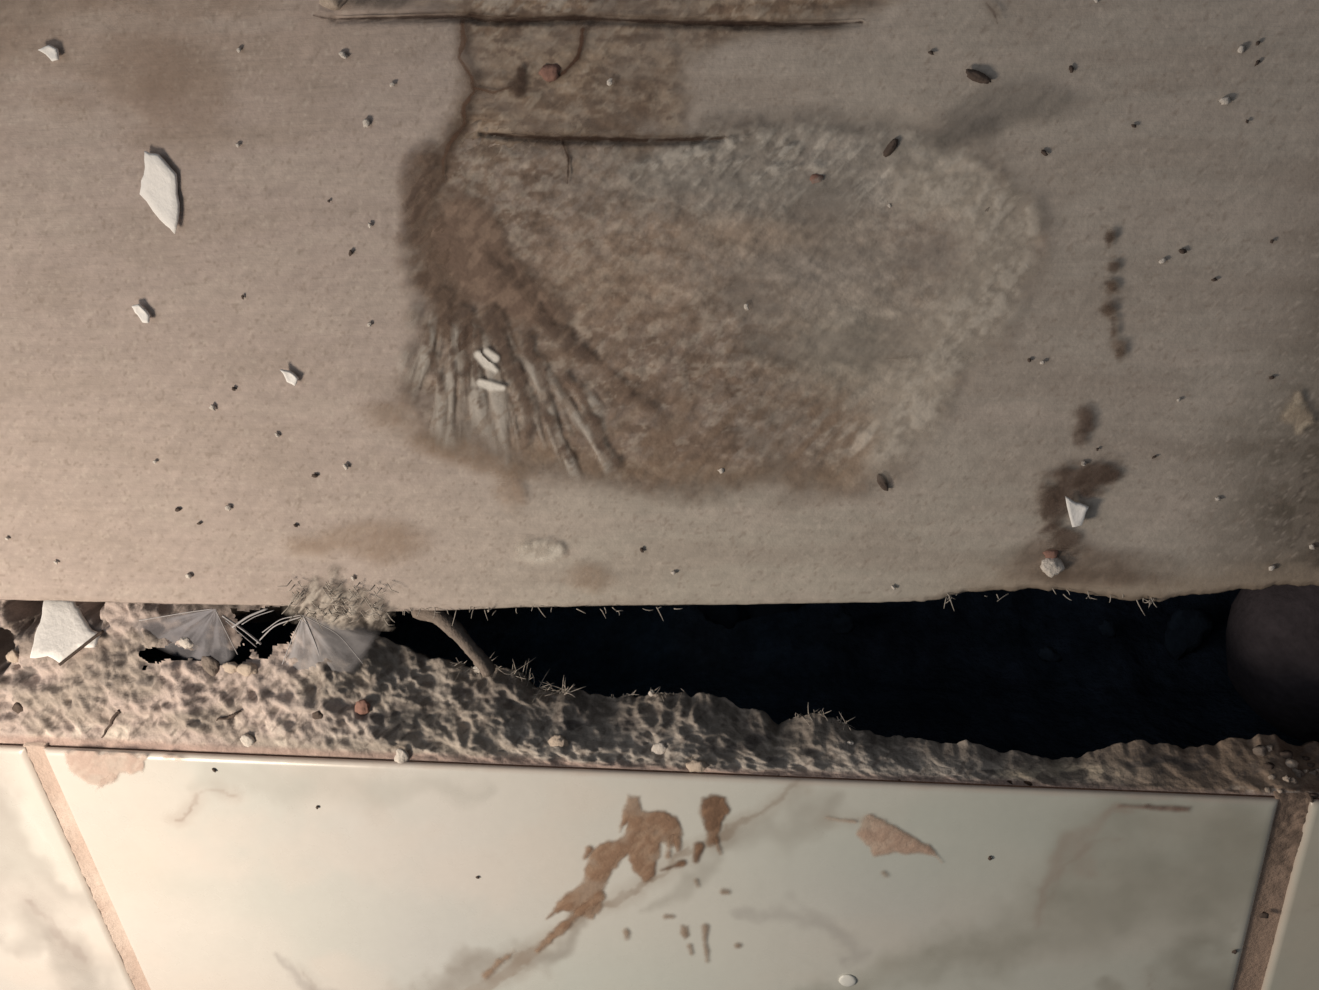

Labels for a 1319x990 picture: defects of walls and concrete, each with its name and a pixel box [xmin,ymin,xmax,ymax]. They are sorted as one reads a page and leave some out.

crack [313,13,863,184]